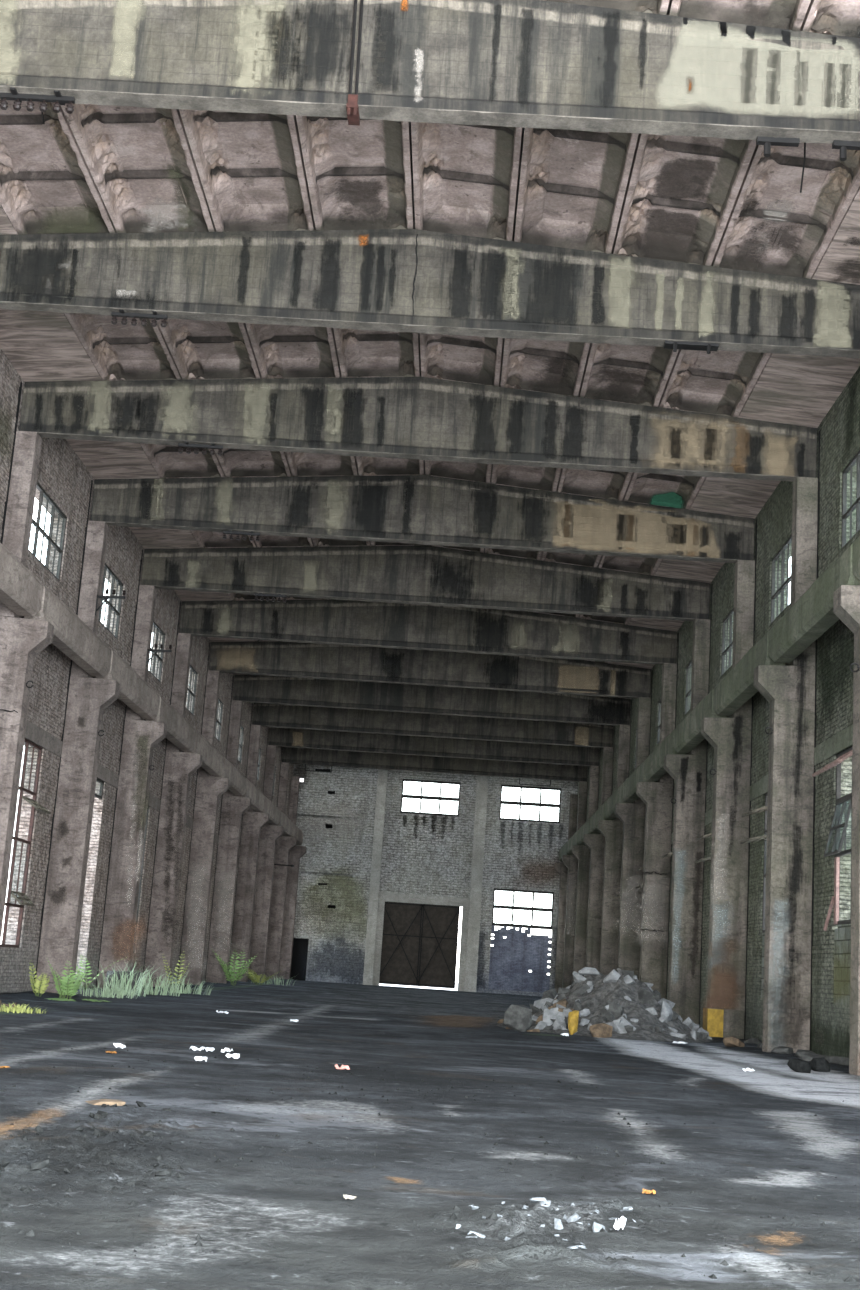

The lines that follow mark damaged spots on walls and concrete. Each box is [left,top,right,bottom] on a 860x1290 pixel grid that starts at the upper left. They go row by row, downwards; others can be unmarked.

water stain [235,0,352,93]
water stain [372,6,401,91]
water stain [238,237,251,305]
water stain [290,238,340,311]
water stain [360,243,396,311]
water stain [449,248,576,328]
water stain [592,159,715,336]
water stain [730,195,801,338]
water stain [778,237,860,349]
water stain [846,383,860,449]